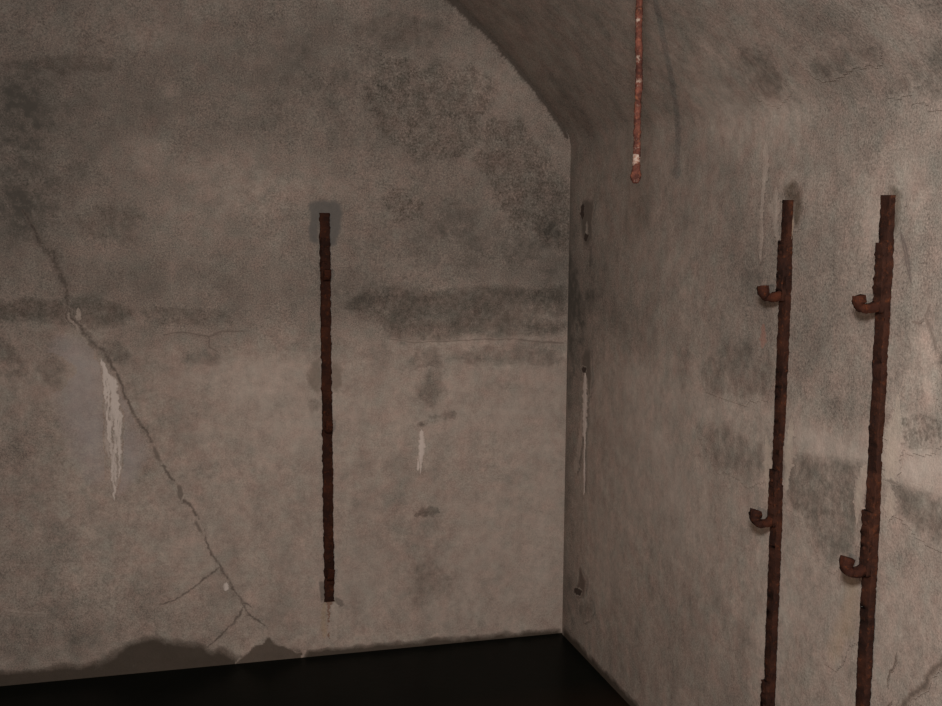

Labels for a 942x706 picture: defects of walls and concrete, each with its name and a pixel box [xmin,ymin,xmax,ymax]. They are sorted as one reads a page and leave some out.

water stain [0,290,233,500]
crack [21,208,266,650]
water stain [416,429,428,474]
water stain [573,373,589,494]
water stain [0,632,247,686]
crack [886,652,942,706]